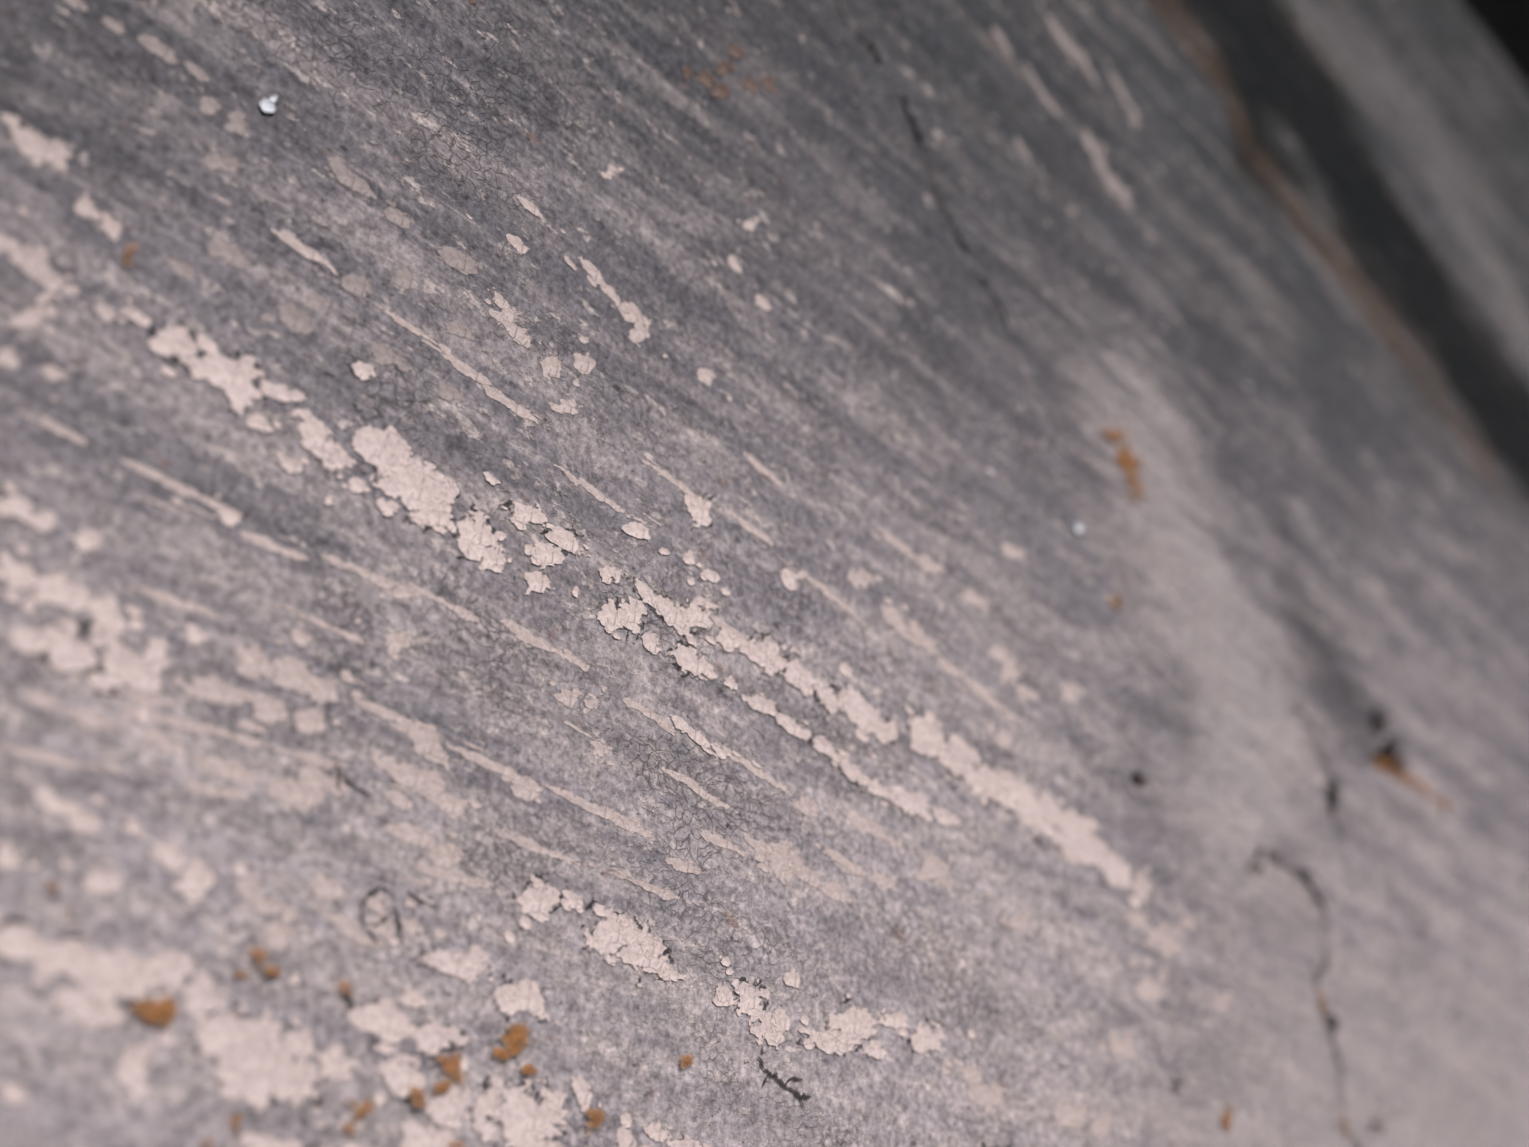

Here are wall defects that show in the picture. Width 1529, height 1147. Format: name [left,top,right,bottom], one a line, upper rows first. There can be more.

peeling [0,113,72,171]
crack [837,0,1009,327]
peeling [0,228,1199,1023]
crack [1286,684,1345,842]
corrosion [131,996,178,1027]
peeling [0,915,352,1147]
corrosion [410,1051,465,1108]
peeling [335,989,601,1147]
corrosion [493,1022,539,1076]
corrosion [680,1054,694,1069]
peeling [712,957,1007,1114]
crack [1246,844,1361,1147]